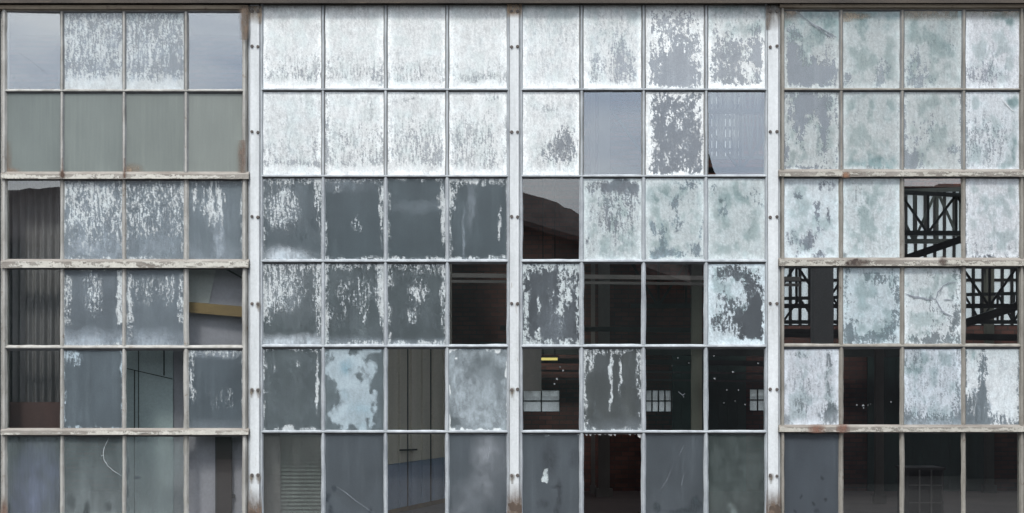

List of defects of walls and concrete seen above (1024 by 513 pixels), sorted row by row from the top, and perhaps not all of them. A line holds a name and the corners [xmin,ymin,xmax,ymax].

corrosion [240,6,262,40]
peeling [1,174,248,377]
peeling [780,11,1024,432]
crack [905,282,955,317]